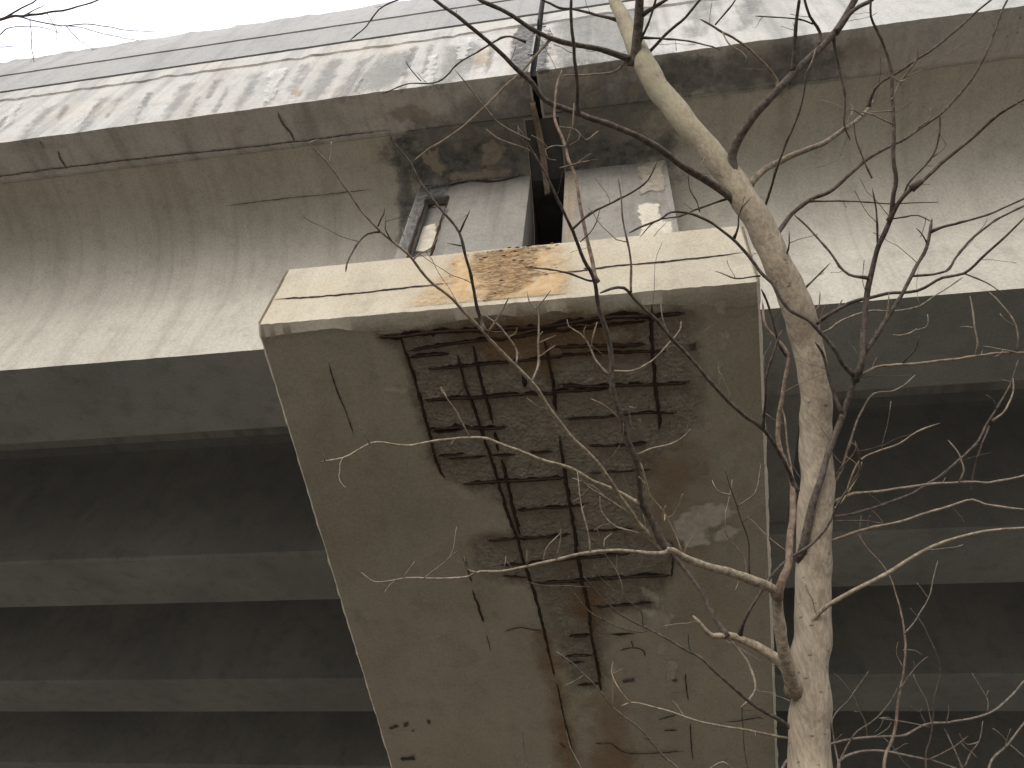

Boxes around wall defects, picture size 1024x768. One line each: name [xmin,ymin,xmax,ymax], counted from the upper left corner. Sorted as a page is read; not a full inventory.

crack [0,113,390,177]
crack [227,189,371,206]
water stain [392,135,515,248]
peeling [637,160,673,236]
crack [280,263,455,299]
corrosion [416,244,567,305]
crack [566,252,743,272]
crack [329,365,354,436]
spalling [378,304,702,691]